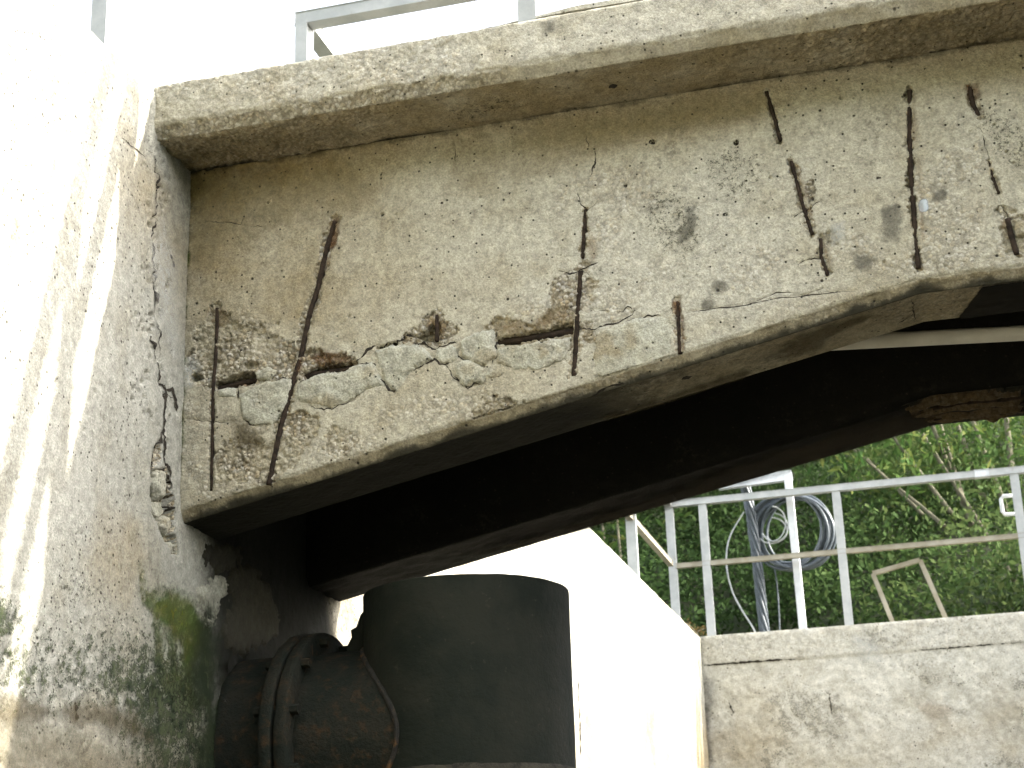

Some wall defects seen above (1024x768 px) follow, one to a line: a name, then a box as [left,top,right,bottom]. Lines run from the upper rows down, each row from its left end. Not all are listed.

crack [122,138,267,512]
crack [332,332,500,393]
spalling [185,207,687,494]
spalling [150,443,178,557]
water stain [70,627,206,768]